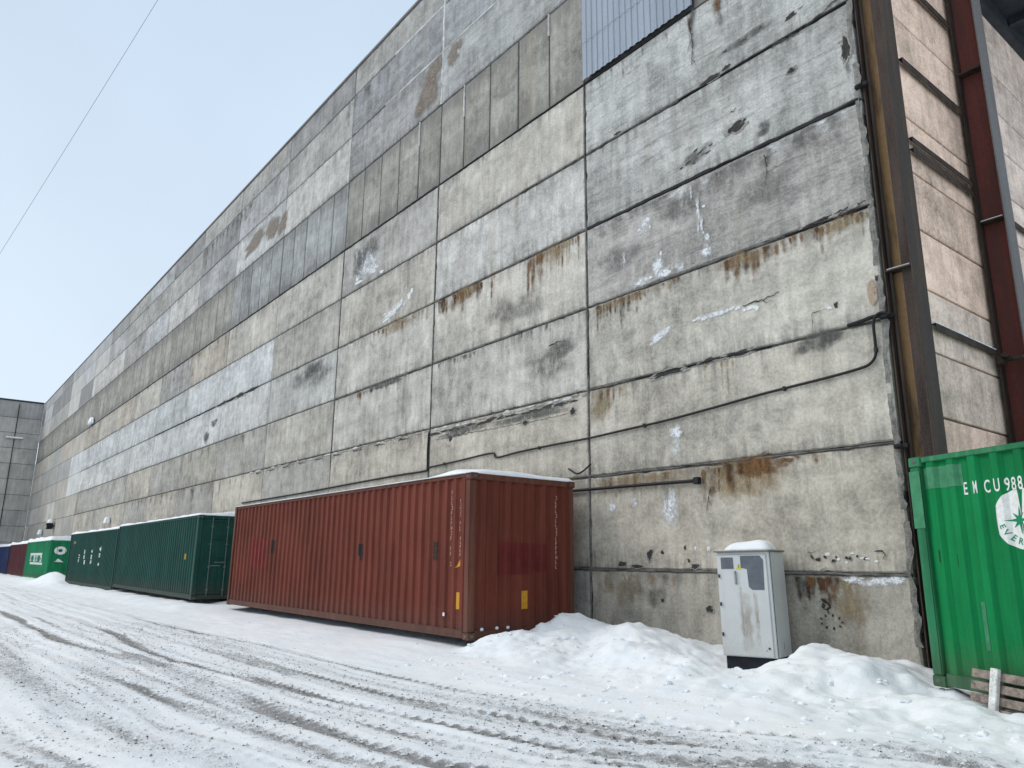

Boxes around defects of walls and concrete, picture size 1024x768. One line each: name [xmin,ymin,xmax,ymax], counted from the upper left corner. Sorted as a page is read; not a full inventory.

spalling [837,30,852,71]
spalling [724,109,749,137]
leakage [659,188,711,256]
rust [527,235,579,292]
leakage [636,251,683,286]
rust [724,211,868,276]
rust [438,275,495,312]
crack [742,292,778,312]
spalling [250,393,587,474]
rust [701,454,800,495]
leakage [662,491,677,522]
spalling [808,550,886,564]